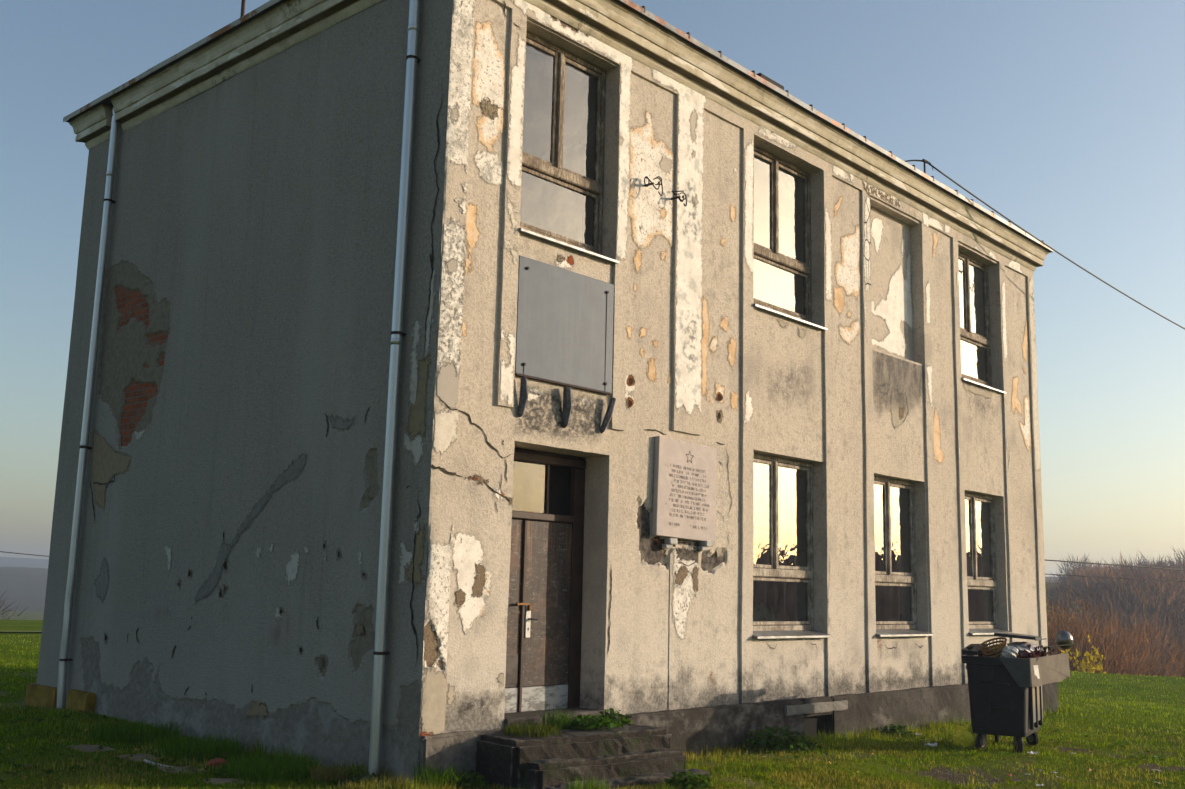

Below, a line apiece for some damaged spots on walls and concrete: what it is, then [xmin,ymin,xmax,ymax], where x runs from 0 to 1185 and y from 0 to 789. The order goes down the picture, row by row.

peeling [408,0,754,424]
peeling [825,166,931,359]
spalling [98,262,170,451]
peeling [402,408,459,466]
crack [432,394,514,512]
water stain [520,391,603,435]
water stain [877,351,921,405]
spalling [81,634,434,784]
spalling [351,605,375,671]
crack [406,485,421,667]
peeling [398,516,495,674]
peeling [637,503,725,640]